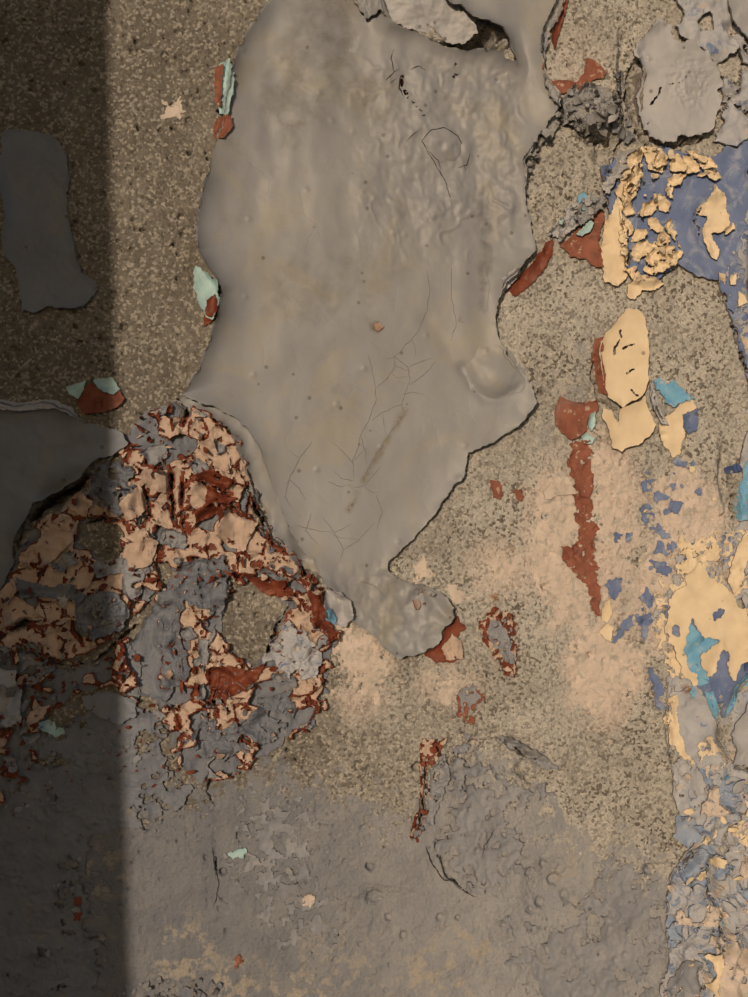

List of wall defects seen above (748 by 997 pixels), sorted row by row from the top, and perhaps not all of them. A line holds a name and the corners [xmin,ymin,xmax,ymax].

crack [386,50,425,104]
peeling [625,0,748,147]
crack [408,127,470,203]
peeling [695,184,735,260]
peeling [718,210,748,370]
peeling [0,0,722,807]
crack [284,268,463,564]
crack [228,469,284,549]
peeling [554,309,748,997]
crack [426,847,475,897]